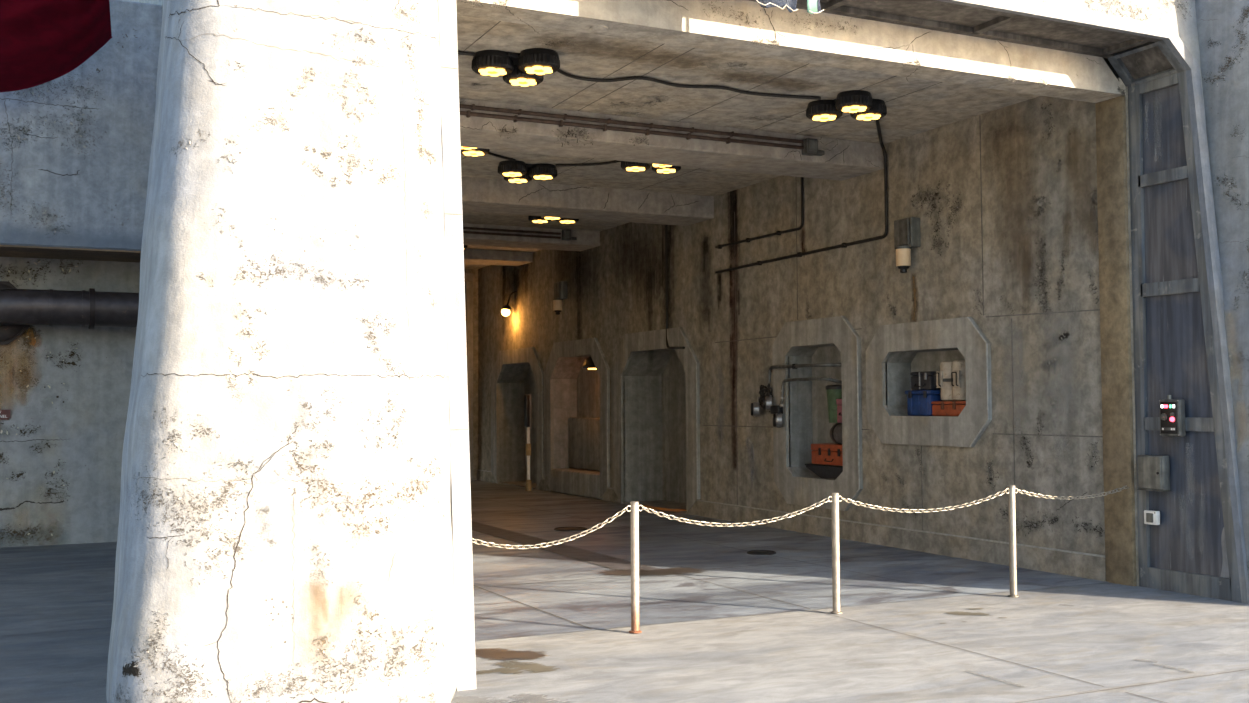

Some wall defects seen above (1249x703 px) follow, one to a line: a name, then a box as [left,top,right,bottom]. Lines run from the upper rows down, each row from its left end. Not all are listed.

crack [165,0,438,86]
crack [141,371,444,382]
crack [0,501,64,511]
crack [132,424,328,703]
damp [475,648,560,675]